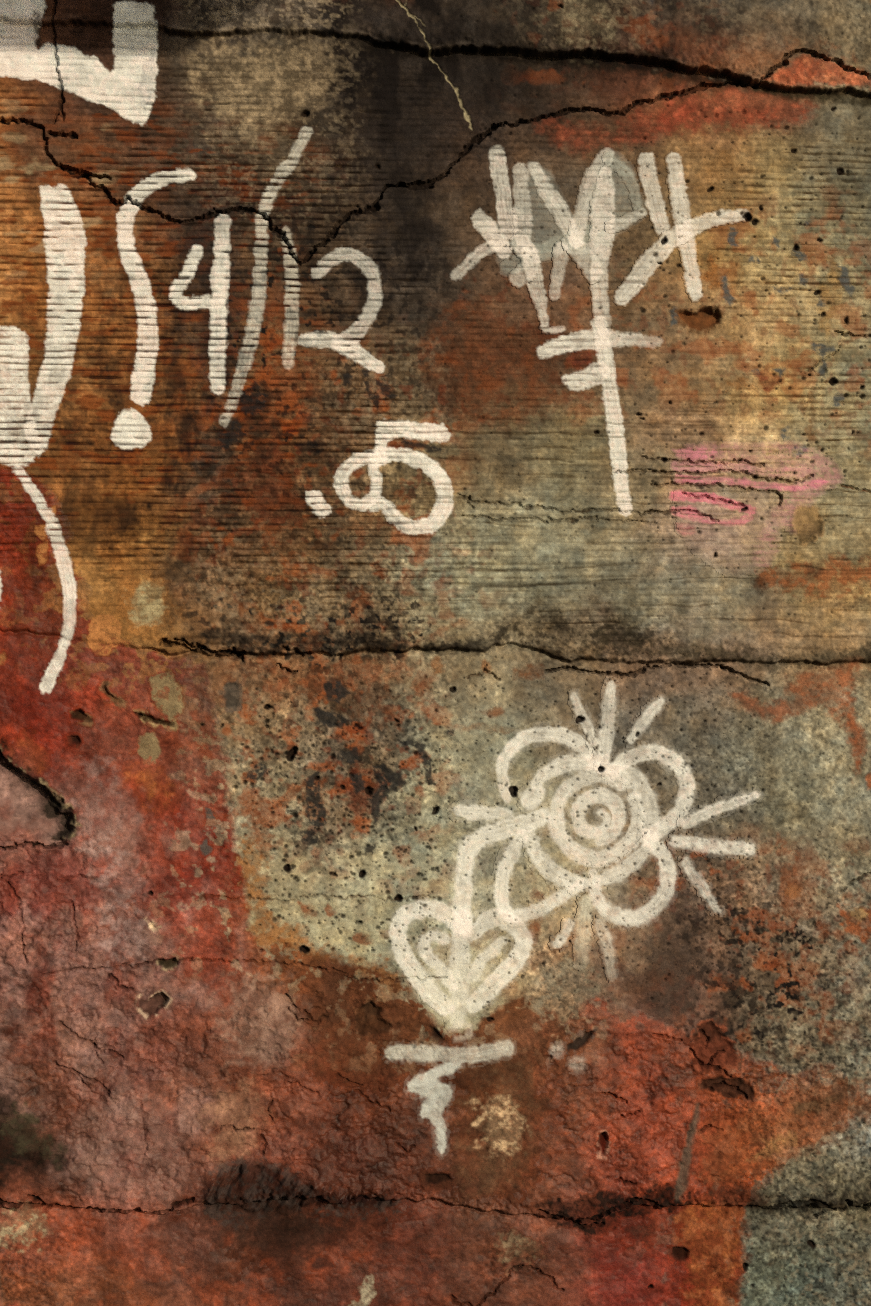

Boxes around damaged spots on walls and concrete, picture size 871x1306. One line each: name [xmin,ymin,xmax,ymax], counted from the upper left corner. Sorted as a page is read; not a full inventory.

water stain [533,0,621,67]
water stain [167,0,534,312]
crack [0,0,871,266]
corrosion [530,29,871,207]
water stain [748,78,871,110]
crack [157,638,312,675]
corrosion [244,650,448,749]
crack [544,661,770,686]
corrosion [115,731,188,819]
corrosion [225,791,397,970]
peeling [0,466,847,1306]
crack [0,1195,195,1214]